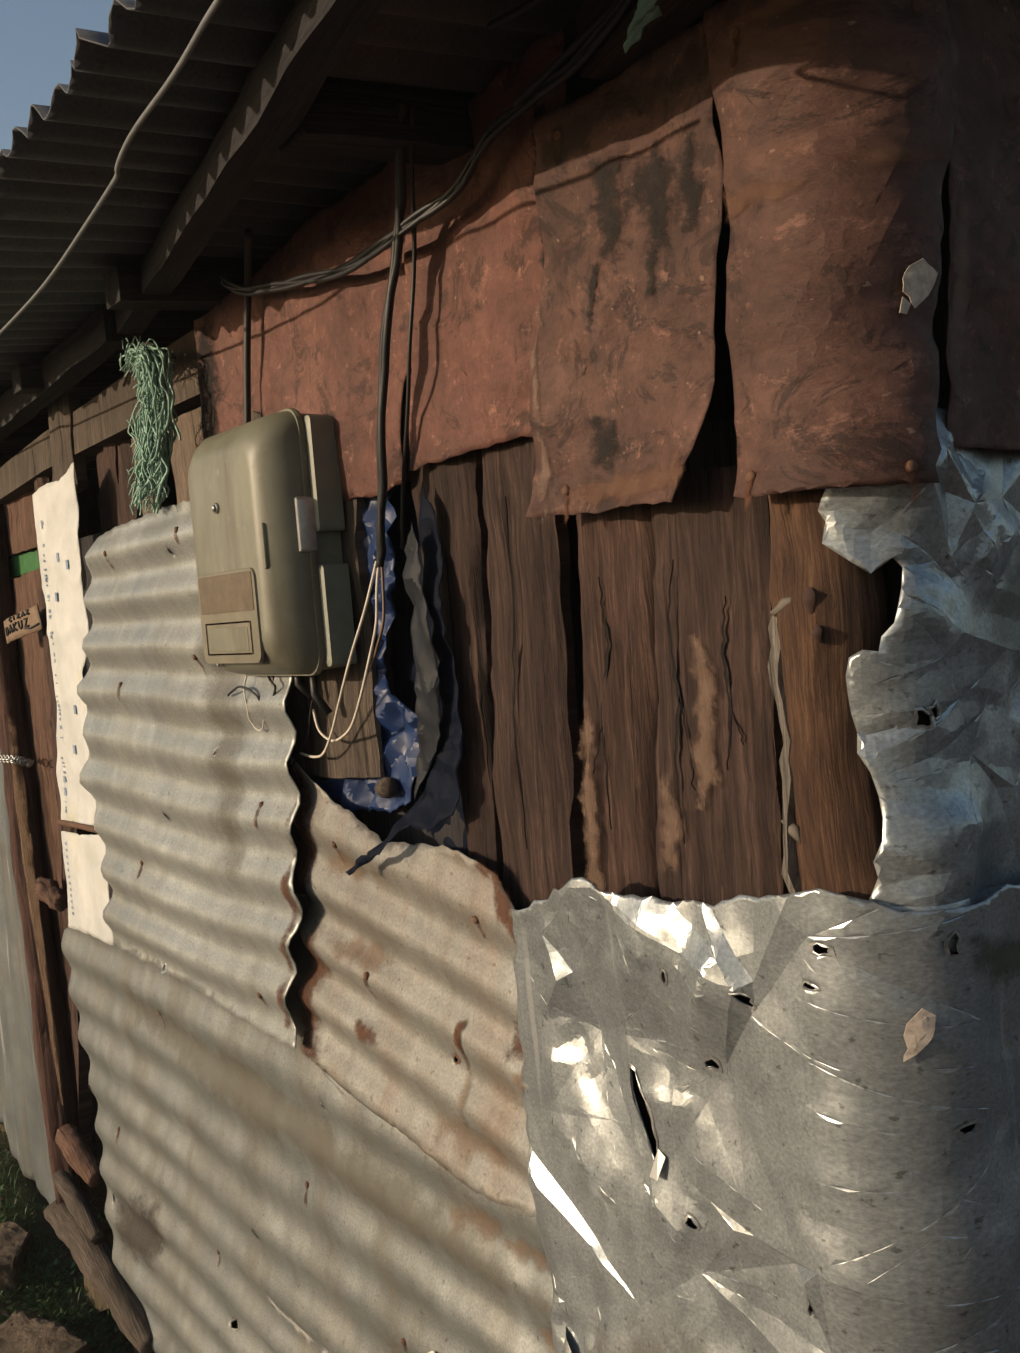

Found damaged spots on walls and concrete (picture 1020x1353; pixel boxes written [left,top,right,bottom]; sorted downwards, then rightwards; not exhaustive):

water stain [586,264,600,331]
peeling [693,637,719,806]
peeling [579,721,604,890]
peeling [661,783,679,868]
rust [260,762,331,1075]
rust [354,1020,375,1044]
rust [454,1020,469,1070]
peeling [903,1008,936,1062]
peeling [650,1149,665,1181]